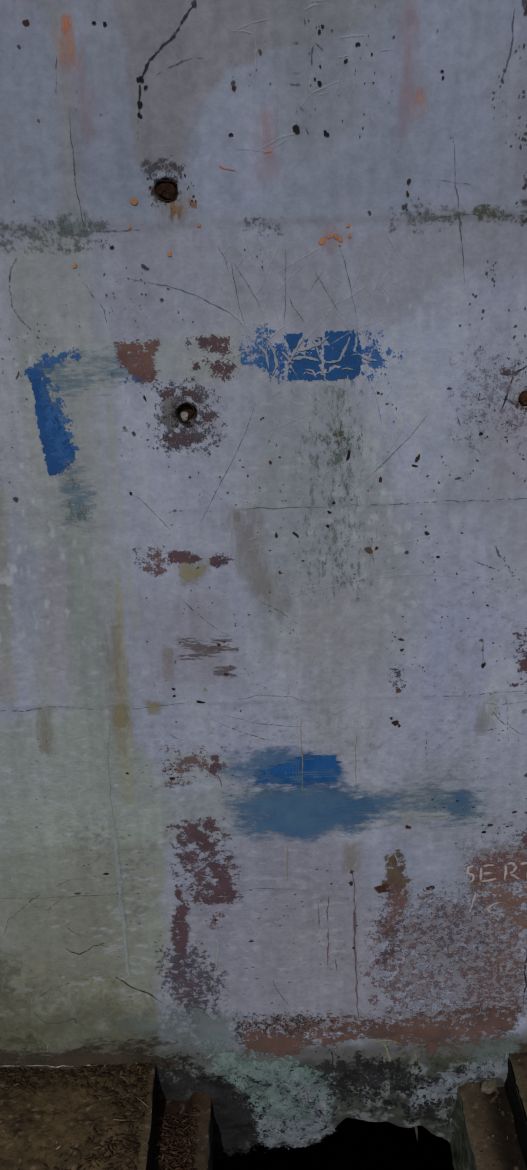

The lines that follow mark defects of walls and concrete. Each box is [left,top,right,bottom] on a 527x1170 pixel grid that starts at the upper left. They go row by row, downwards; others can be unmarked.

corrosion [151,174,196,218]
water stain [0,1009,527,1163]
spalling [146,1058,527,1170]